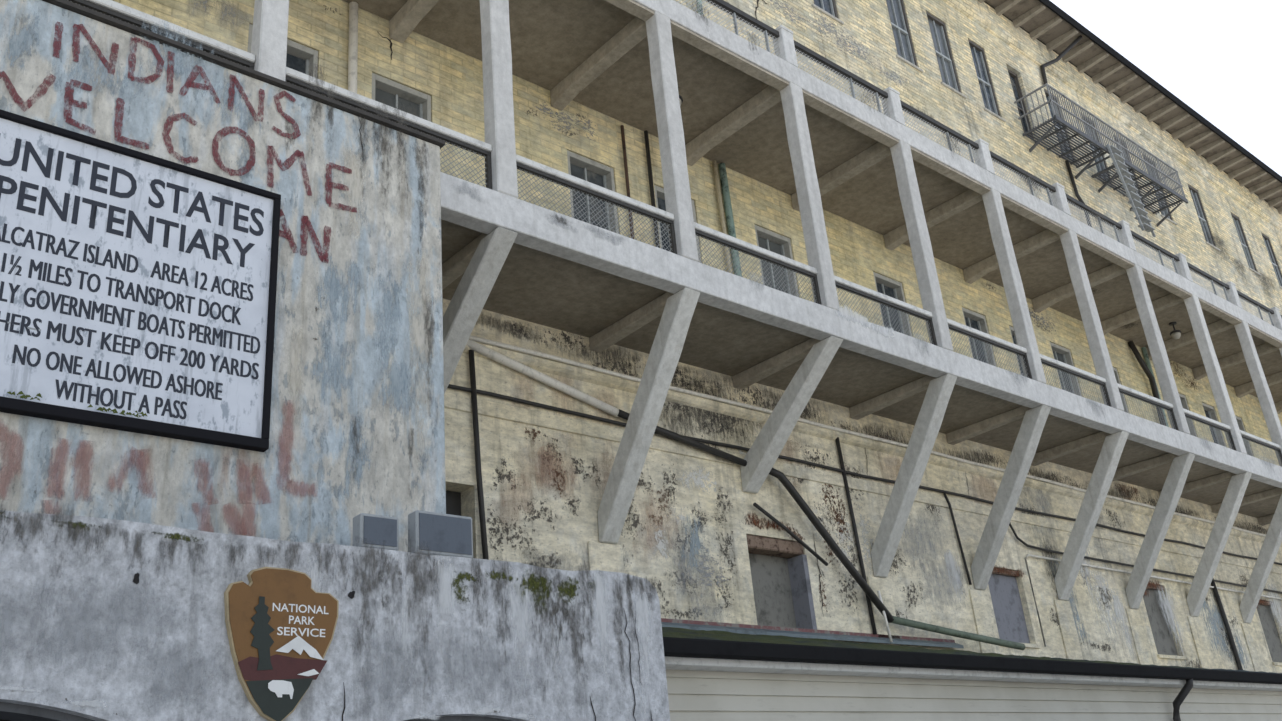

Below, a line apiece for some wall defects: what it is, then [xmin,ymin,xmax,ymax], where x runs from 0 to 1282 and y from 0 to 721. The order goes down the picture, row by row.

leakage [0,504,142,558]